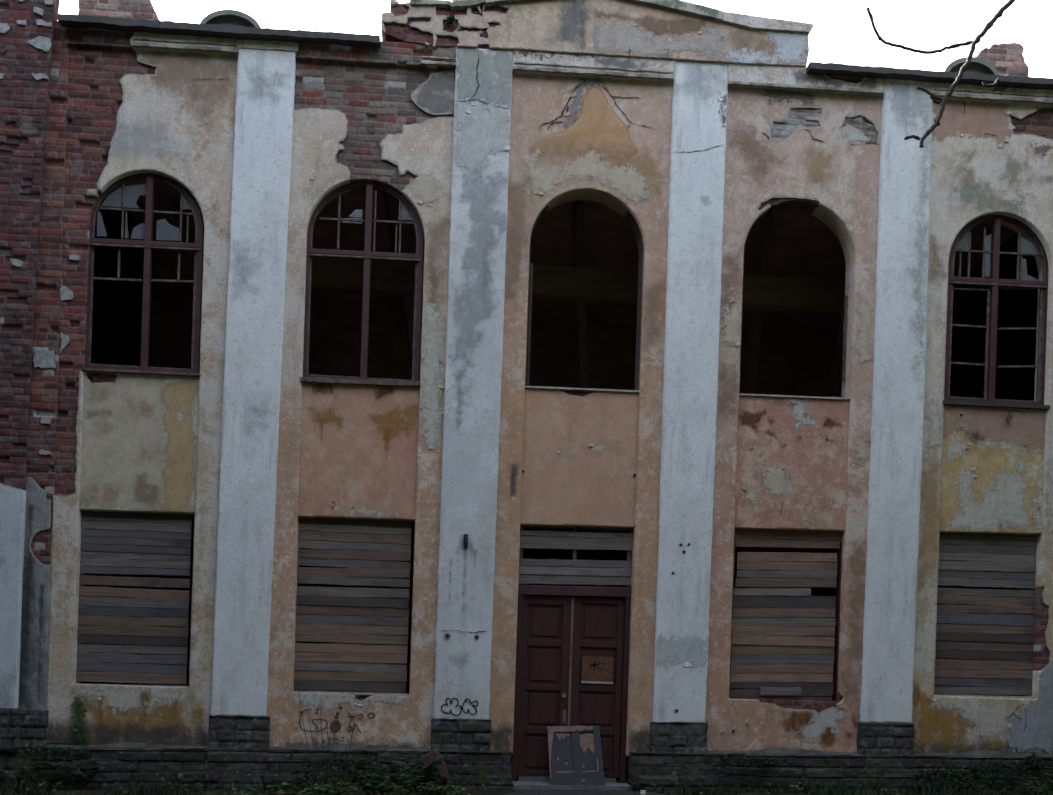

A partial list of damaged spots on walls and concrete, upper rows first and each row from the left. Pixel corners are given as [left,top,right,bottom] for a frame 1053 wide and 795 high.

flaking render [294,3,511,195]
peeling [563,77,602,129]
crack [461,46,793,130]
flaking render [757,88,822,141]
flaking render [840,114,879,150]
peeling [932,86,1053,156]
peeling [522,146,654,206]
flaking render [0,0,198,565]
damp [454,171,526,395]
peeling [786,399,818,430]
peeling [943,405,1046,533]
peeling [928,587,1053,754]